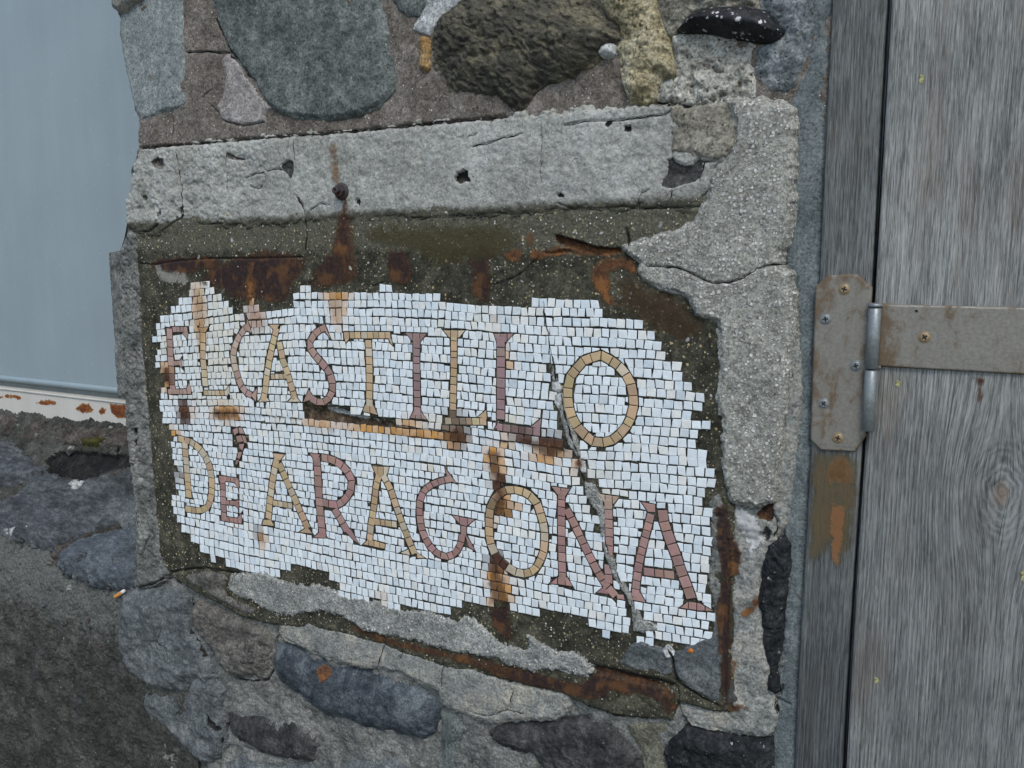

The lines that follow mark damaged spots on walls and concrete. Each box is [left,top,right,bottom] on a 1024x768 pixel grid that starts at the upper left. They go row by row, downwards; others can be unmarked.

spalling [662,97,736,188]
corrosion [151,251,305,303]
corrosion [314,199,356,287]
corrosion [470,233,636,303]
crack [648,264,785,284]
crack [396,258,720,710]
spalling [757,503,774,541]
corrosion [490,604,512,640]
corrosion [715,503,760,712]
corrosion [354,627,676,715]